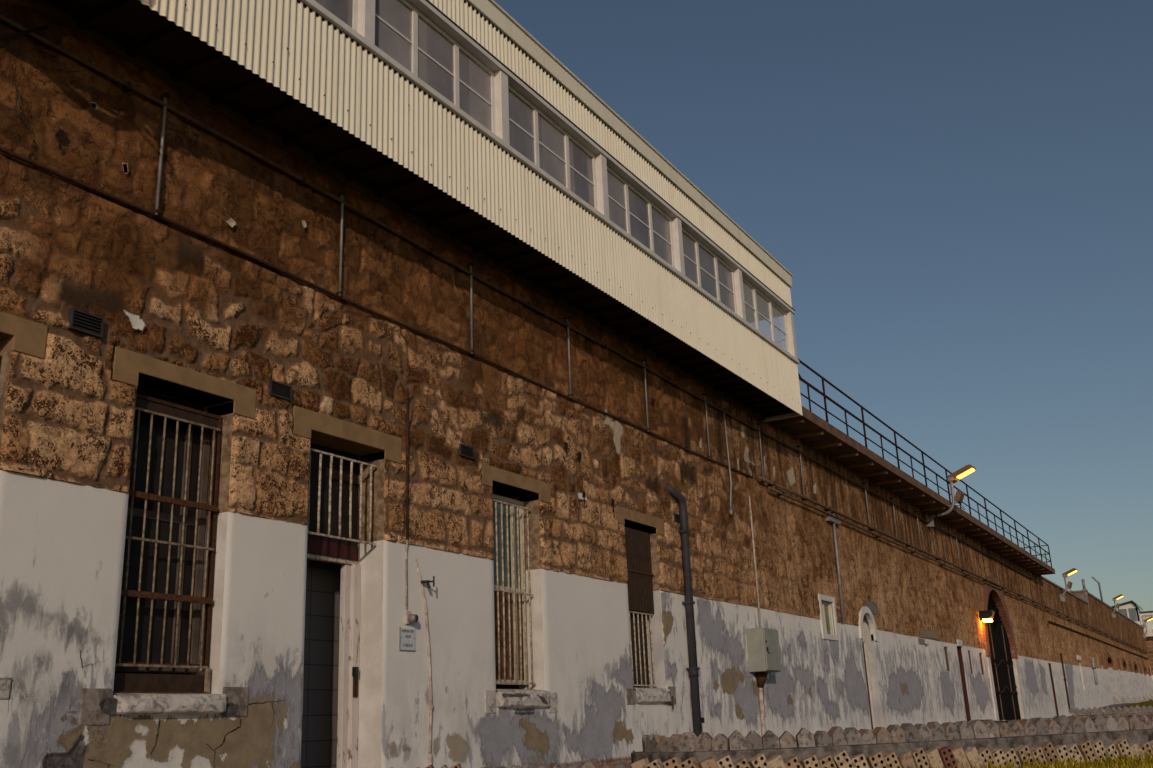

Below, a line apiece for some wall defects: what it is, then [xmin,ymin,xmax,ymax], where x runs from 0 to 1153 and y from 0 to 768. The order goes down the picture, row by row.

flaking render [19,662,304,768]
peeling [475,656,636,768]
peeling [697,599,869,727]
peeling [886,667,924,716]
peeling [940,671,955,715]
peeling [970,672,990,714]